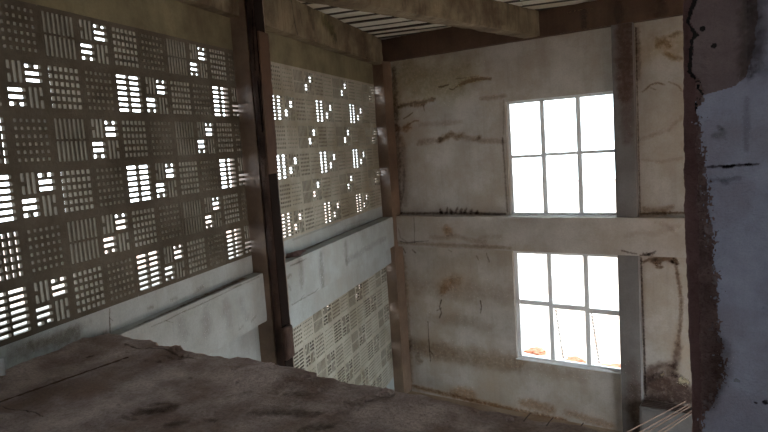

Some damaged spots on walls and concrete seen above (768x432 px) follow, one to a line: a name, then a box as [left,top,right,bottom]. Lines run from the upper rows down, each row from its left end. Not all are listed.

crack [686,0,704,111]
flaking render [690,0,758,432]